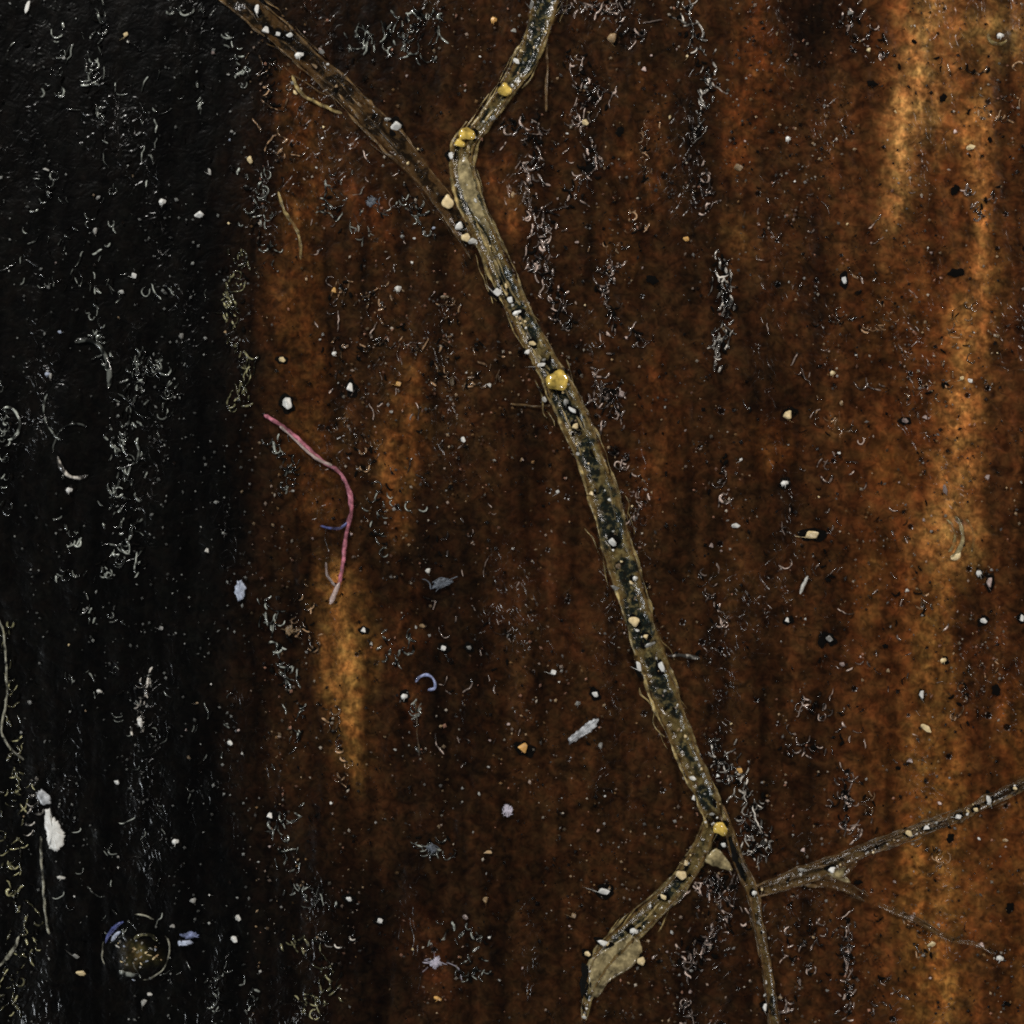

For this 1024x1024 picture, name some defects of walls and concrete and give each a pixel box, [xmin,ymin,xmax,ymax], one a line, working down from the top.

crack [219,0,1024,1024]